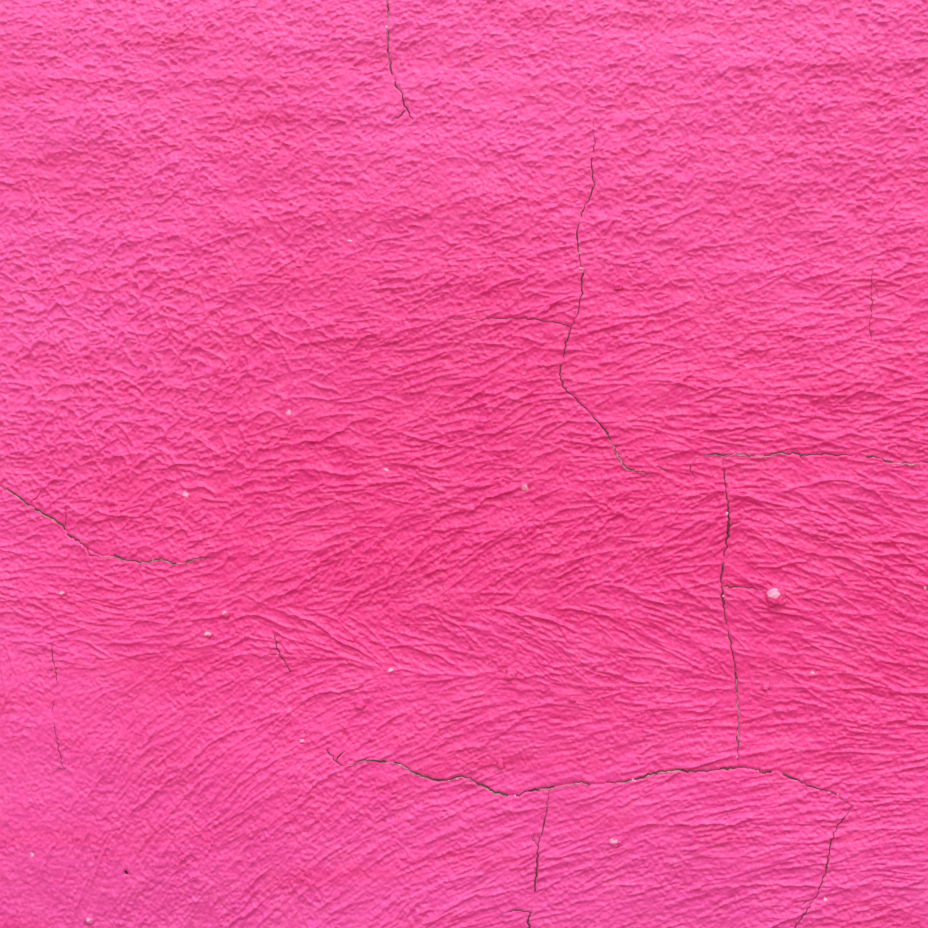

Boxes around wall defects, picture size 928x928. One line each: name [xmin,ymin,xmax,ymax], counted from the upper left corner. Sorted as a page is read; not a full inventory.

crack [385,0,413,119]
crack [450,122,667,473]
crack [1,486,213,566]
crack [327,451,928,928]